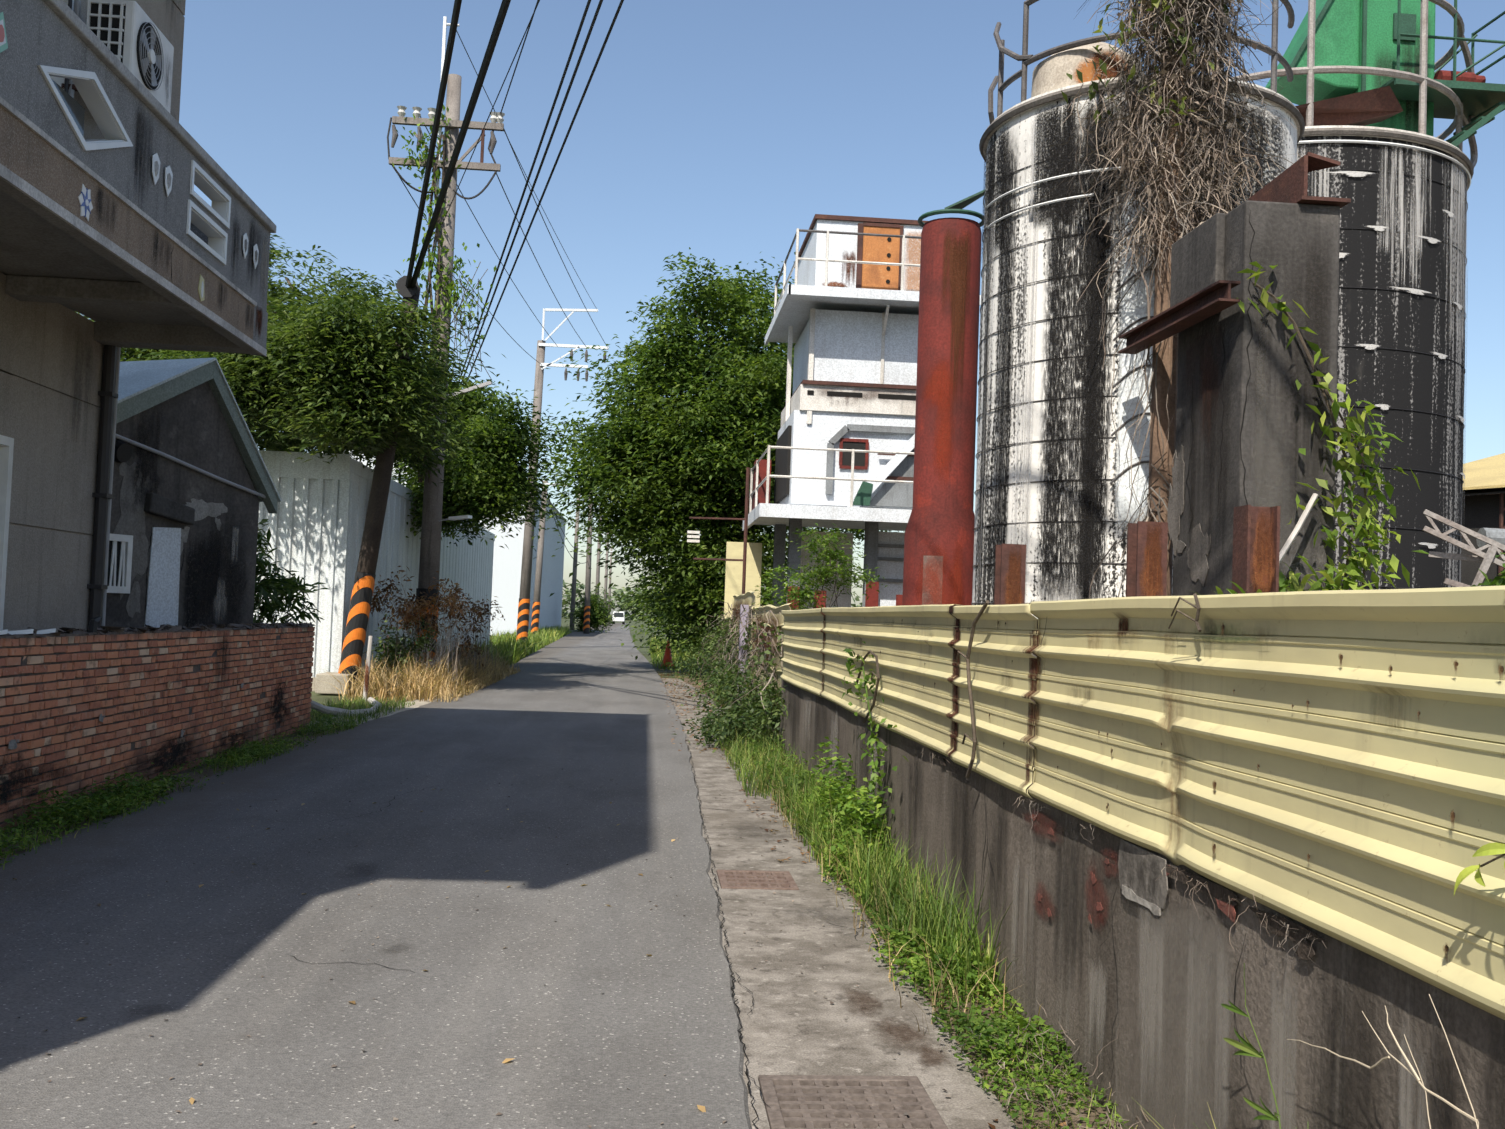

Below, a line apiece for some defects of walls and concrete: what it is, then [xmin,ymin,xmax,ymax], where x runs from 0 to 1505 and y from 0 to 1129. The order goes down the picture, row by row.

damp [1315,168,1329,197]
damp [1385,153,1427,280]
corrosion [907,234,921,291]
corrosion [943,236,970,386]
damp [977,100,1137,599]
damp [1450,173,1468,392]
peeling [180,498,228,556]
corrosion [1140,528,1162,596]
corrosion [1252,512,1274,591]
damp [1090,972,1105,1036]
damp [1140,915,1228,1129]